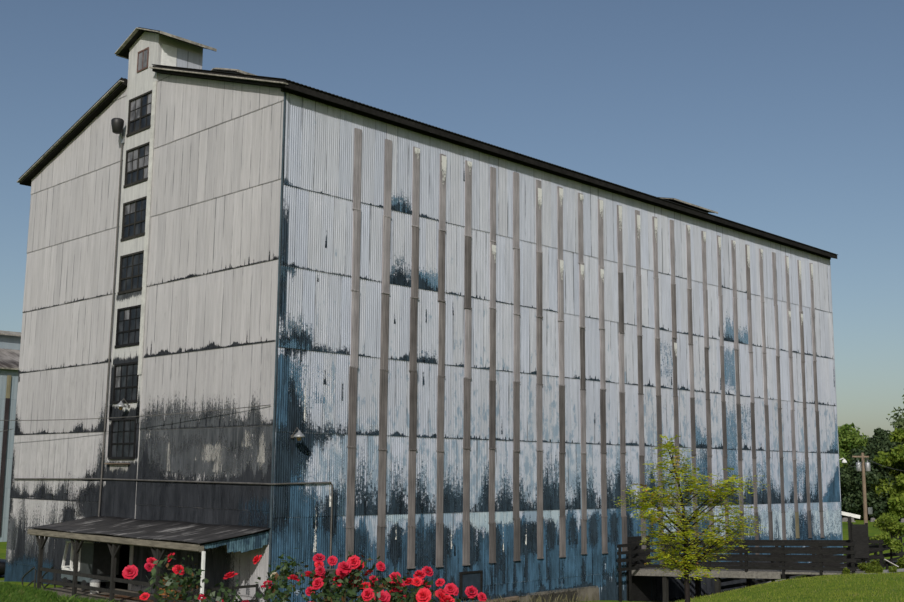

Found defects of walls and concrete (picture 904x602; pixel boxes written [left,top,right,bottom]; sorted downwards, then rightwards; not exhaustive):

damp [360,193,460,226]
damp [22,252,485,313]
damp [624,323,834,359]
damp [389,350,776,400]
damp [6,314,379,586]
damp [272,427,819,602]
damp [132,539,250,599]